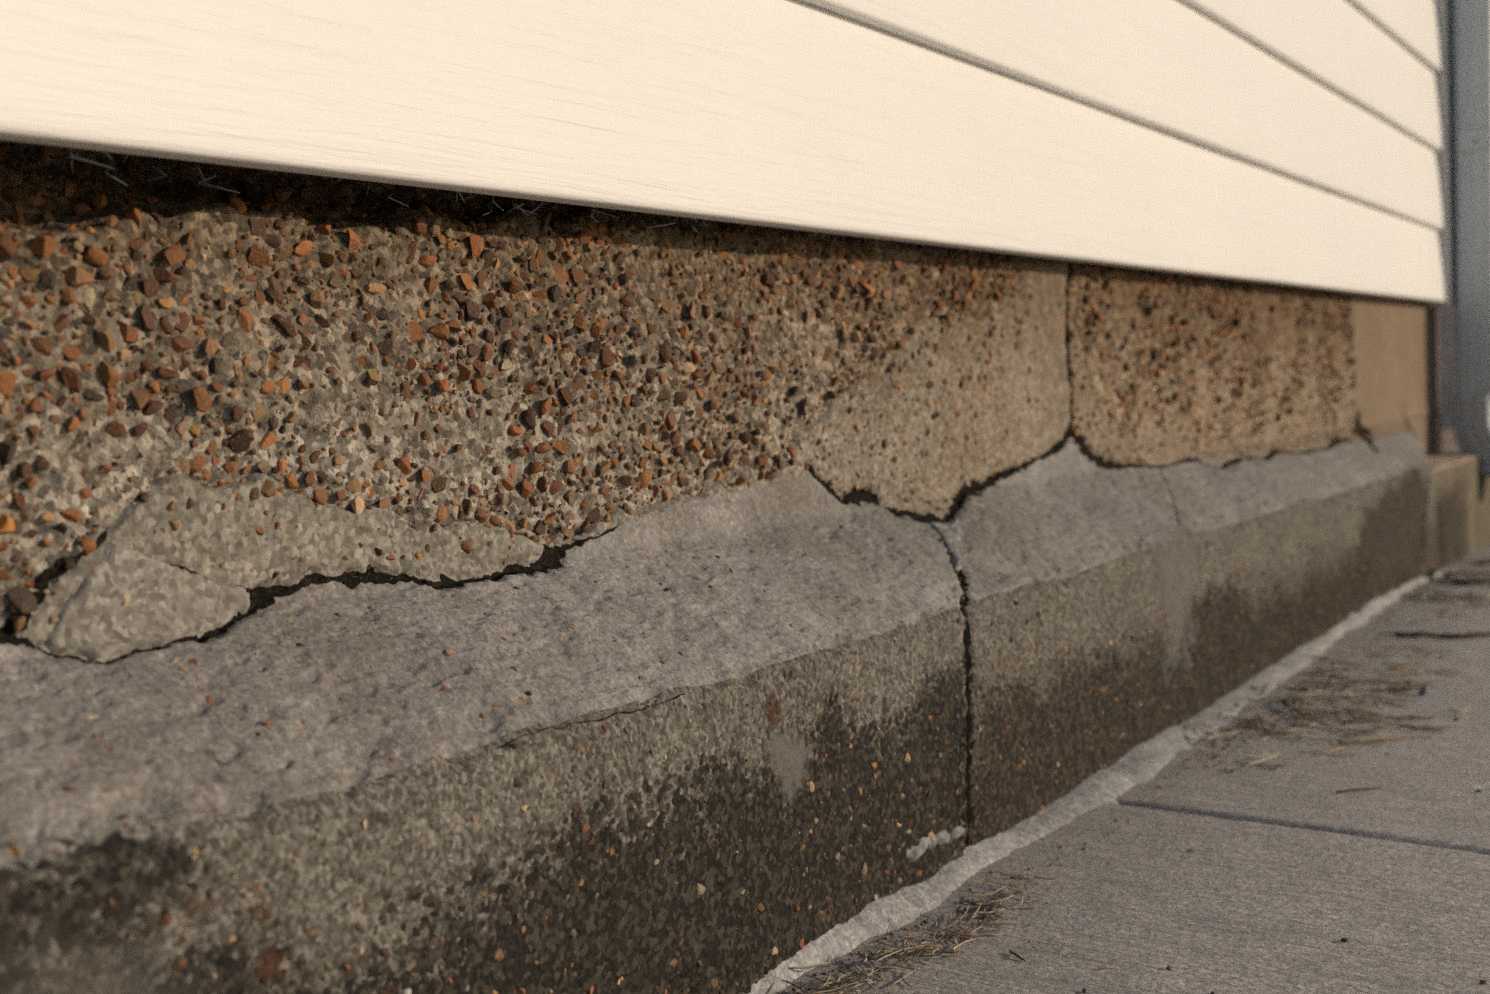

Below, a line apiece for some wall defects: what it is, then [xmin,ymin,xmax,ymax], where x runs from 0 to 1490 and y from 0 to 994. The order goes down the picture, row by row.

spalling [0,140,1022,663]
crack [805,263,1421,528]
crack [0,526,618,664]
damp [153,468,1471,994]
damp [0,830,210,994]